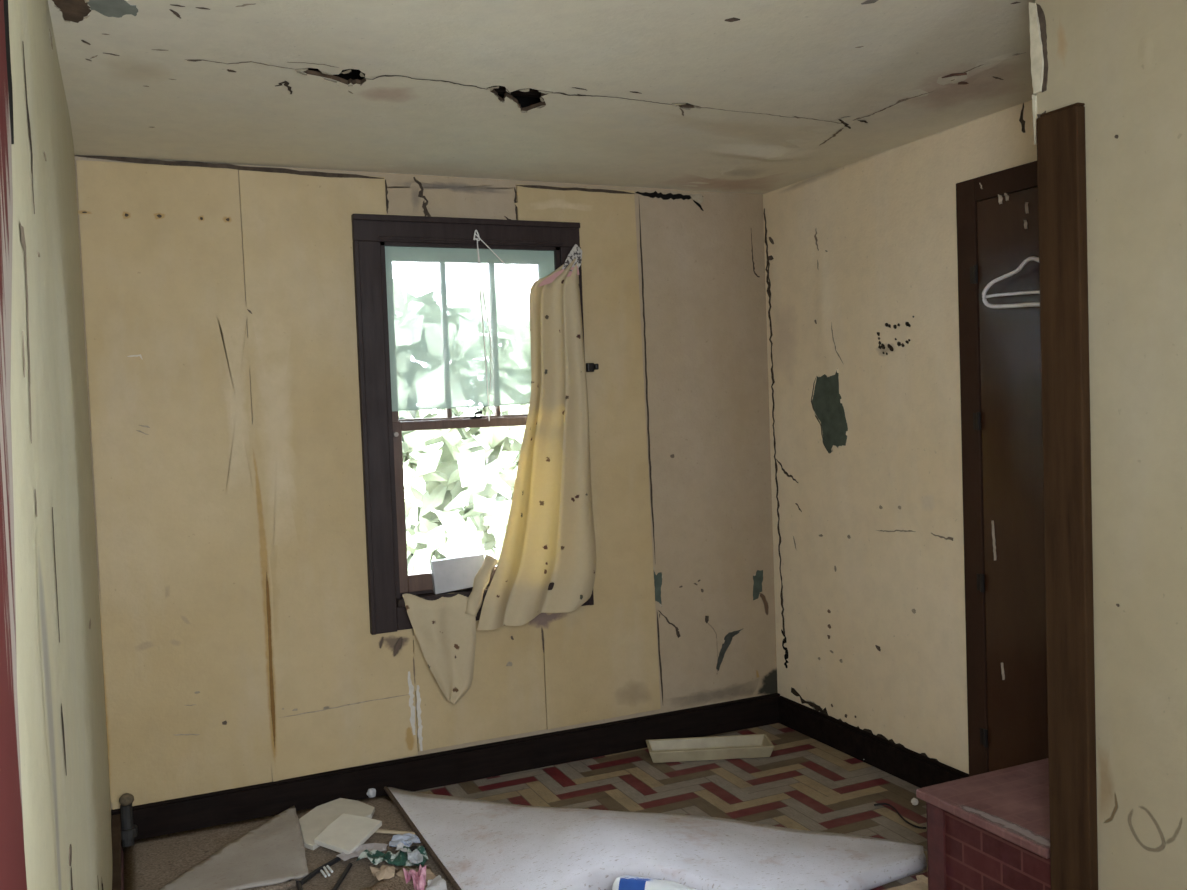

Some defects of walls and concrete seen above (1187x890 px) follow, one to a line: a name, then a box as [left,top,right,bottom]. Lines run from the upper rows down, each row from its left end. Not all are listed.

peeling [52,0,138,23]
crack [185,59,339,94]
crack [365,75,488,90]
crack [556,64,984,146]
crack [1018,103,1026,133]
crack [385,177,431,217]
peeling [812,368,848,453]
crack [751,208,802,668]
damp [269,545,283,654]
peeling [653,567,663,607]
flaking render [705,616,744,674]